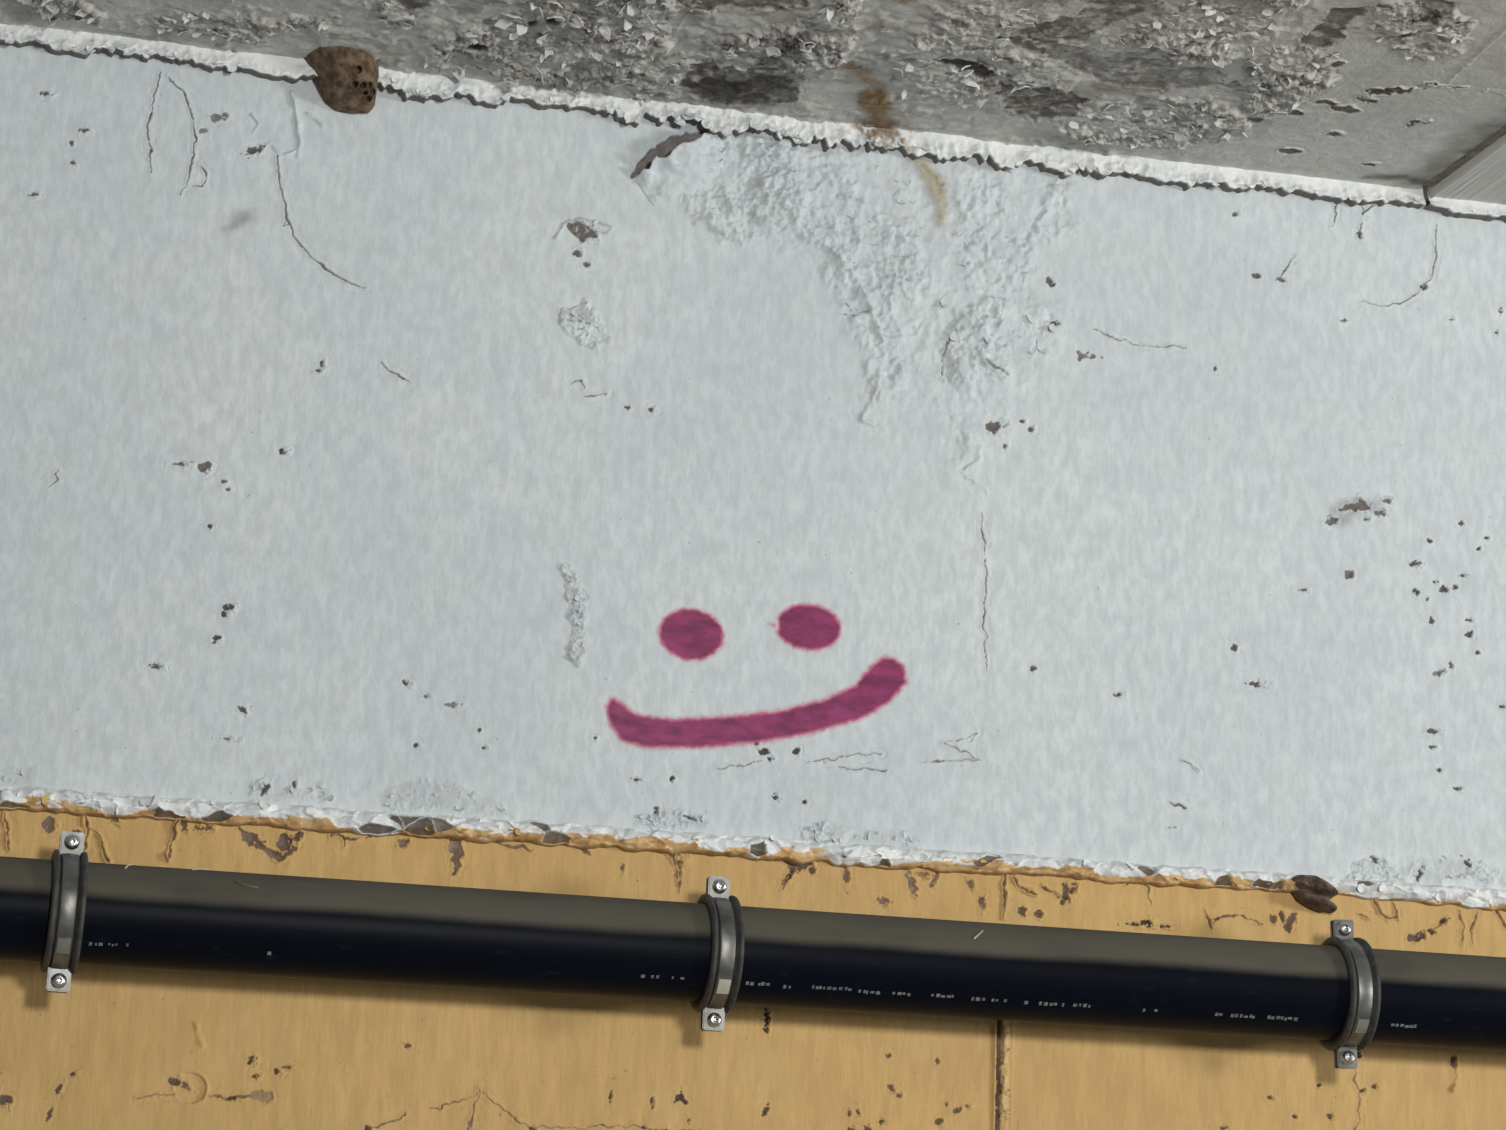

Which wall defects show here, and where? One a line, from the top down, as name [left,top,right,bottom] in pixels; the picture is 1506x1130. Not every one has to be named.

peeling [9,0,346,72]
peeling [30,86,61,102]
peeling [62,122,98,170]
crack [141,65,212,202]
peeling [194,88,327,164]
corrosion [841,64,947,219]
crack [270,149,373,294]
peeling [361,0,1480,497]
peeling [303,350,333,379]
crack [1351,899,1506,953]
crack [358,1078,717,1130]
crack [1347,1051,1368,1130]